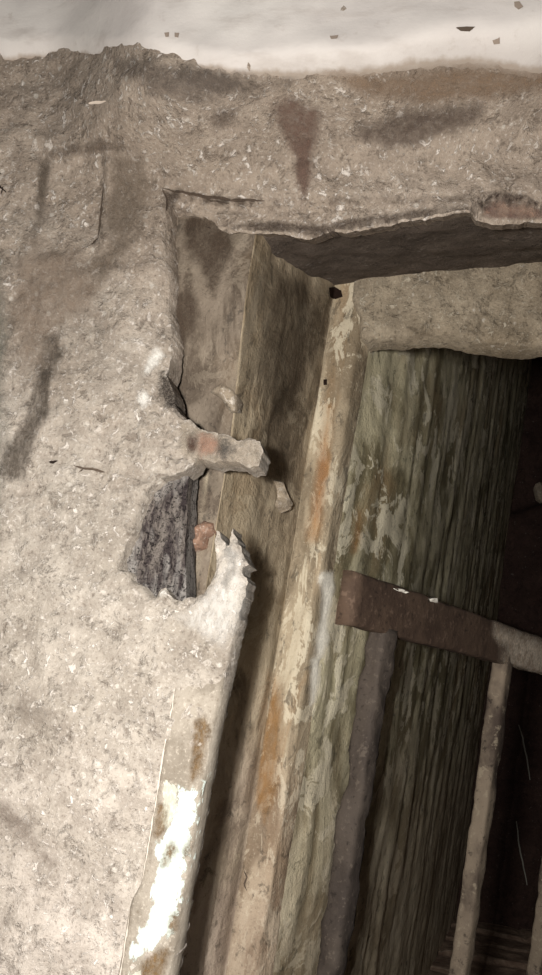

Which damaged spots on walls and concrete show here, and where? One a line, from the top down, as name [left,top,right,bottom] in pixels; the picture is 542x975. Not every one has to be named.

damp [279,101,316,189]
damp [363,109,476,144]
crack [92,184,104,244]
damp [0,339,60,479]